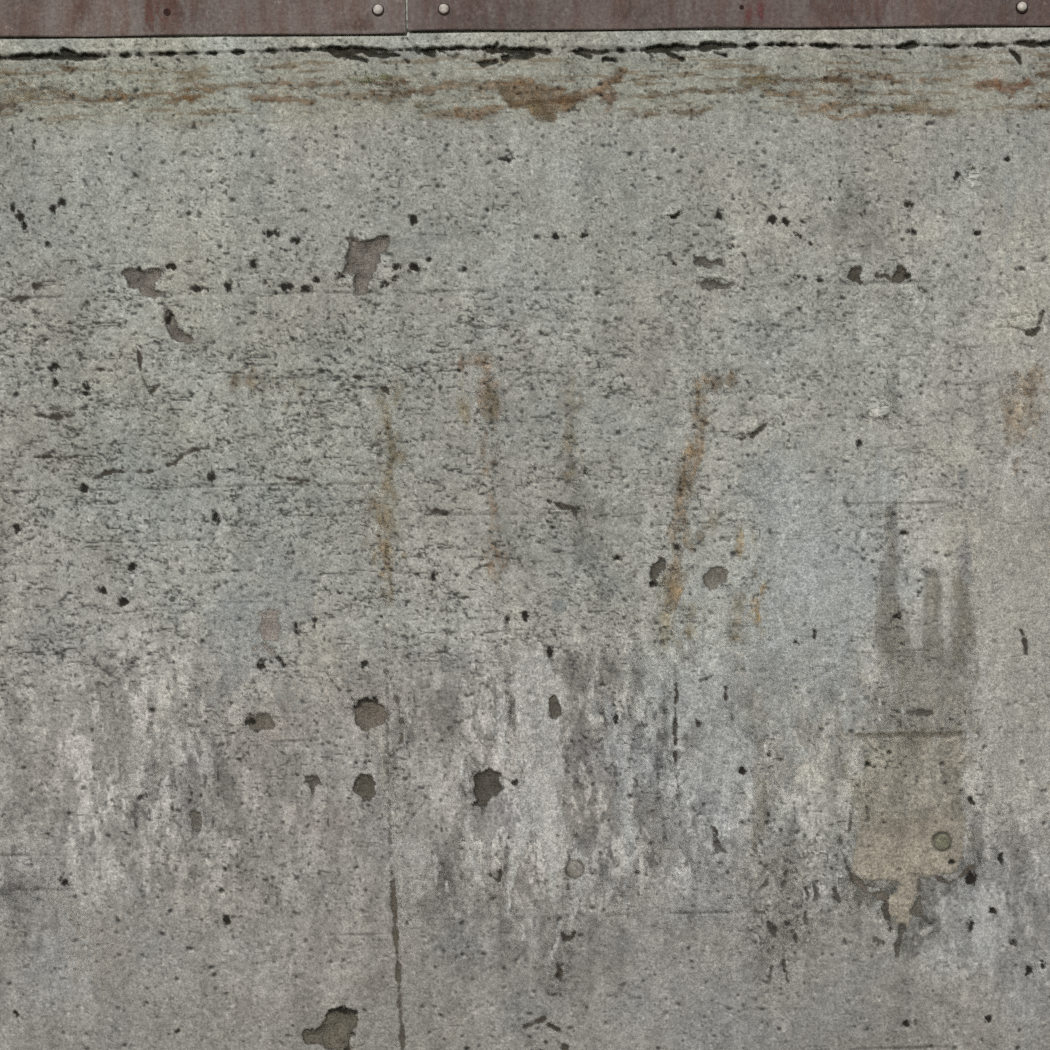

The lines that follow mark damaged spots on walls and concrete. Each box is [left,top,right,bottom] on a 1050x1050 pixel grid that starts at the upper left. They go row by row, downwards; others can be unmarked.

crack [0,41,1050,67]
corrosion [64,84,214,103]
corrosion [250,68,627,120]
corrosion [723,72,953,120]
corrosion [975,72,1050,98]
spalling [335,235,401,295]
damp [634,448,1050,850]
spalling [353,697,387,731]
spalling [473,768,518,806]
peeling [736,807,983,983]
spalling [302,1006,364,1050]